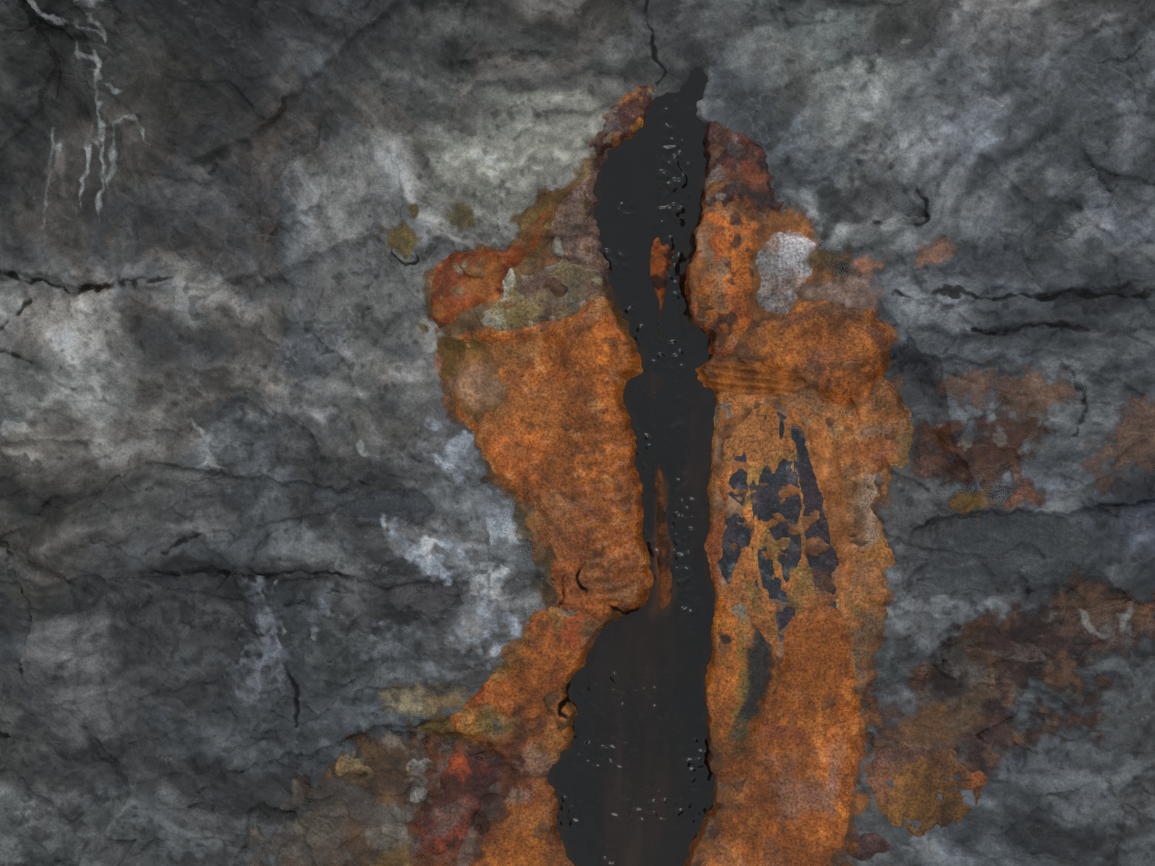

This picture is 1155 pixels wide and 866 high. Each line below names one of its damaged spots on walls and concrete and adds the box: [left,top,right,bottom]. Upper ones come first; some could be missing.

corrosion [249,85,656,866]
corrosion [684,121,1155,866]